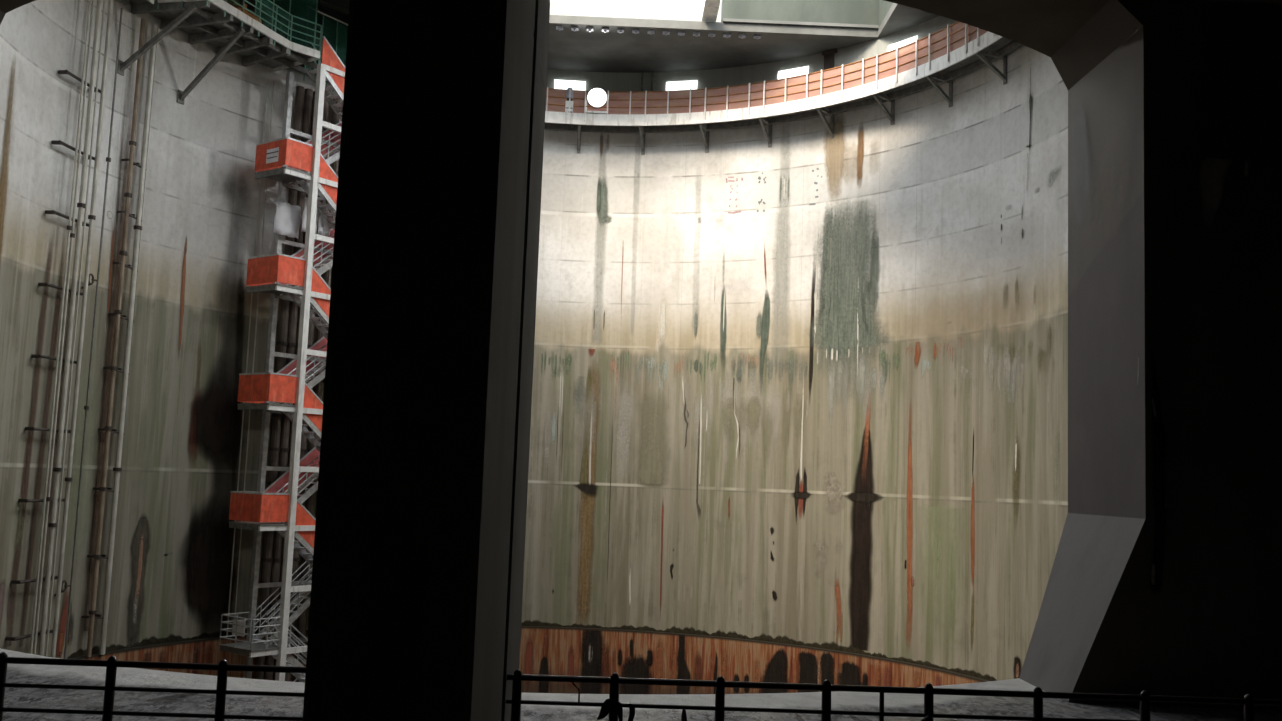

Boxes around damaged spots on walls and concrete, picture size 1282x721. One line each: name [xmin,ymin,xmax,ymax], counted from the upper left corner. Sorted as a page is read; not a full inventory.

rust [179,238,187,350]
leakage [67,287,258,659]
leakage [521,178,997,681]
rust [905,424,914,638]
leakage [1013,657,1021,679]